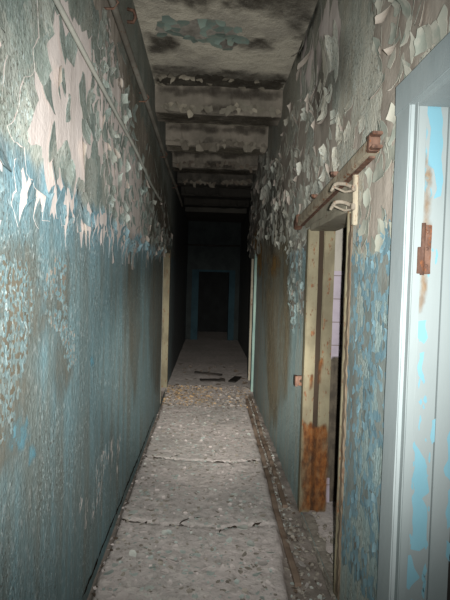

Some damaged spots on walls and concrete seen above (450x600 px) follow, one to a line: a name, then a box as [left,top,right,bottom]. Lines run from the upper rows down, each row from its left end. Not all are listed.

peeling [0,0,173,270]
peeling [155,0,365,334]
peeling [327,0,450,600]
corrosion [302,423,327,512]